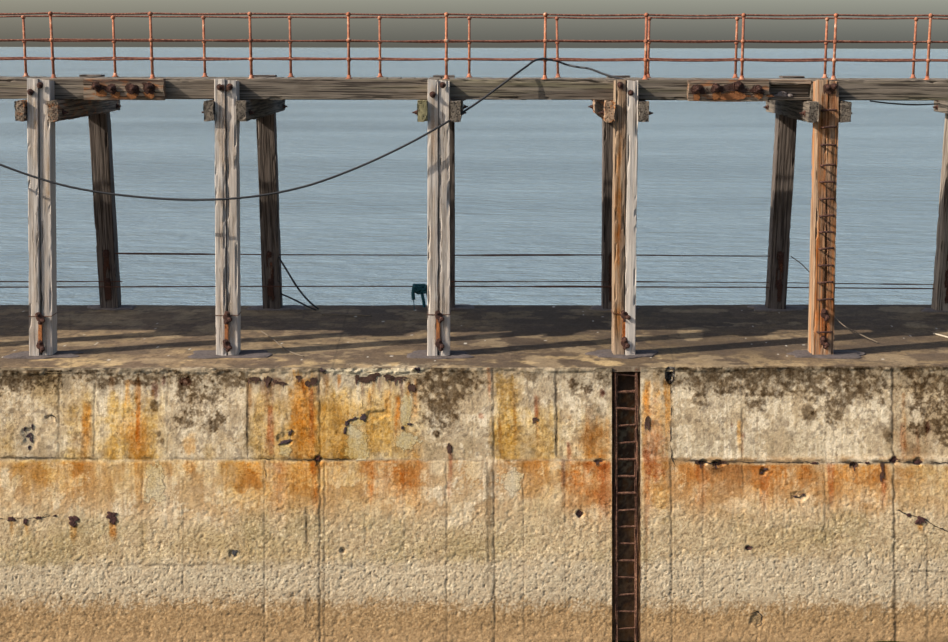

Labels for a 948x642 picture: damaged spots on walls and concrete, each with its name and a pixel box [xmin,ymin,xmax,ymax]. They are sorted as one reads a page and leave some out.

water stain [0,370,62,396]
water stain [74,369,245,432]
corrosion [247,376,317,390]
corrosion [355,372,415,393]
water stain [408,368,489,437]
water stain [659,366,887,422]
water stain [900,365,948,446]
crack [0,514,79,527]
crack [106,511,117,525]
crack [898,510,947,531]